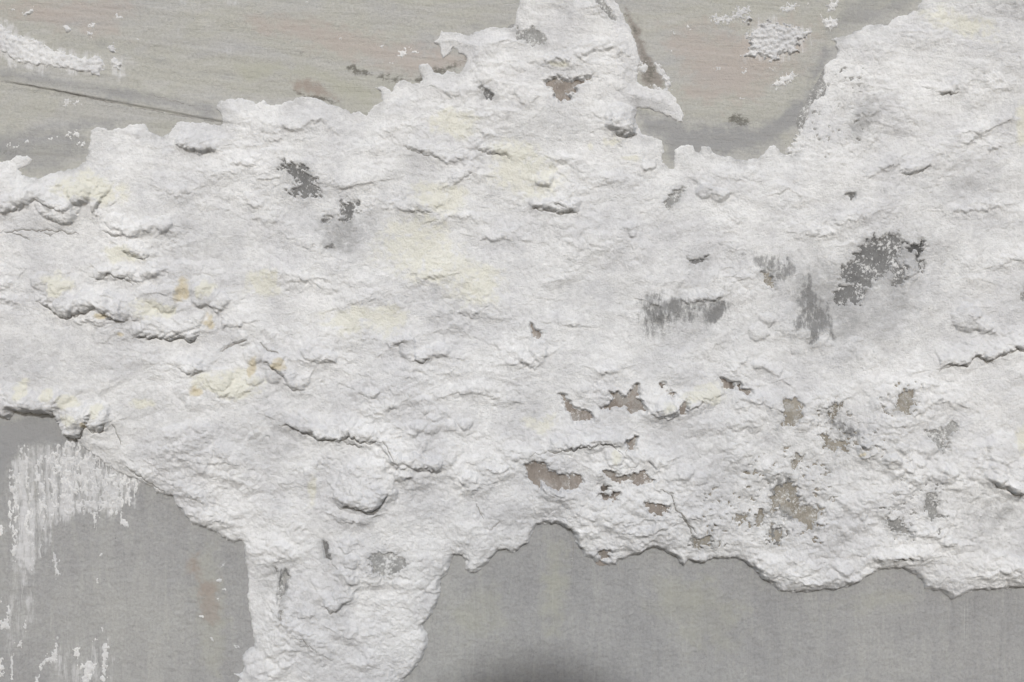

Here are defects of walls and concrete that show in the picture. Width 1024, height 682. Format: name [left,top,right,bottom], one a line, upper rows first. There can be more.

leakage [460,124,582,212]
leakage [304,209,386,262]
leakage [616,264,746,351]
leakage [765,208,949,369]
peeling [833,234,925,306]
crack [943,348,1024,369]
peeling [561,384,646,421]
crack [279,425,394,462]
peeling [525,461,583,491]
peeling [600,470,654,502]
spalling [687,447,835,558]
leakage [979,487,1024,540]